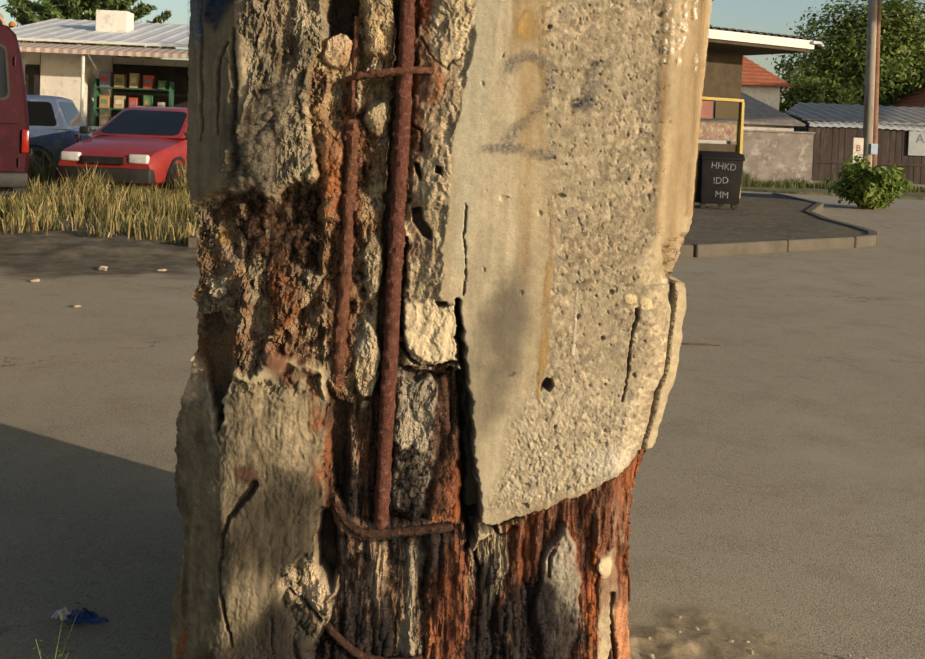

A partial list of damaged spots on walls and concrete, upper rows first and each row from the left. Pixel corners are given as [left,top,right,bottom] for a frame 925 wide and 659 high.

rust [326,109,365,244]
crack [411,122,424,152]
rust [412,0,432,147]
spalling [177,0,687,659]
crack [399,203,566,597]
crack [621,307,641,402]
crack [637,272,678,454]
crack [218,480,259,647]
rust [513,512,551,588]
rust [560,453,641,659]